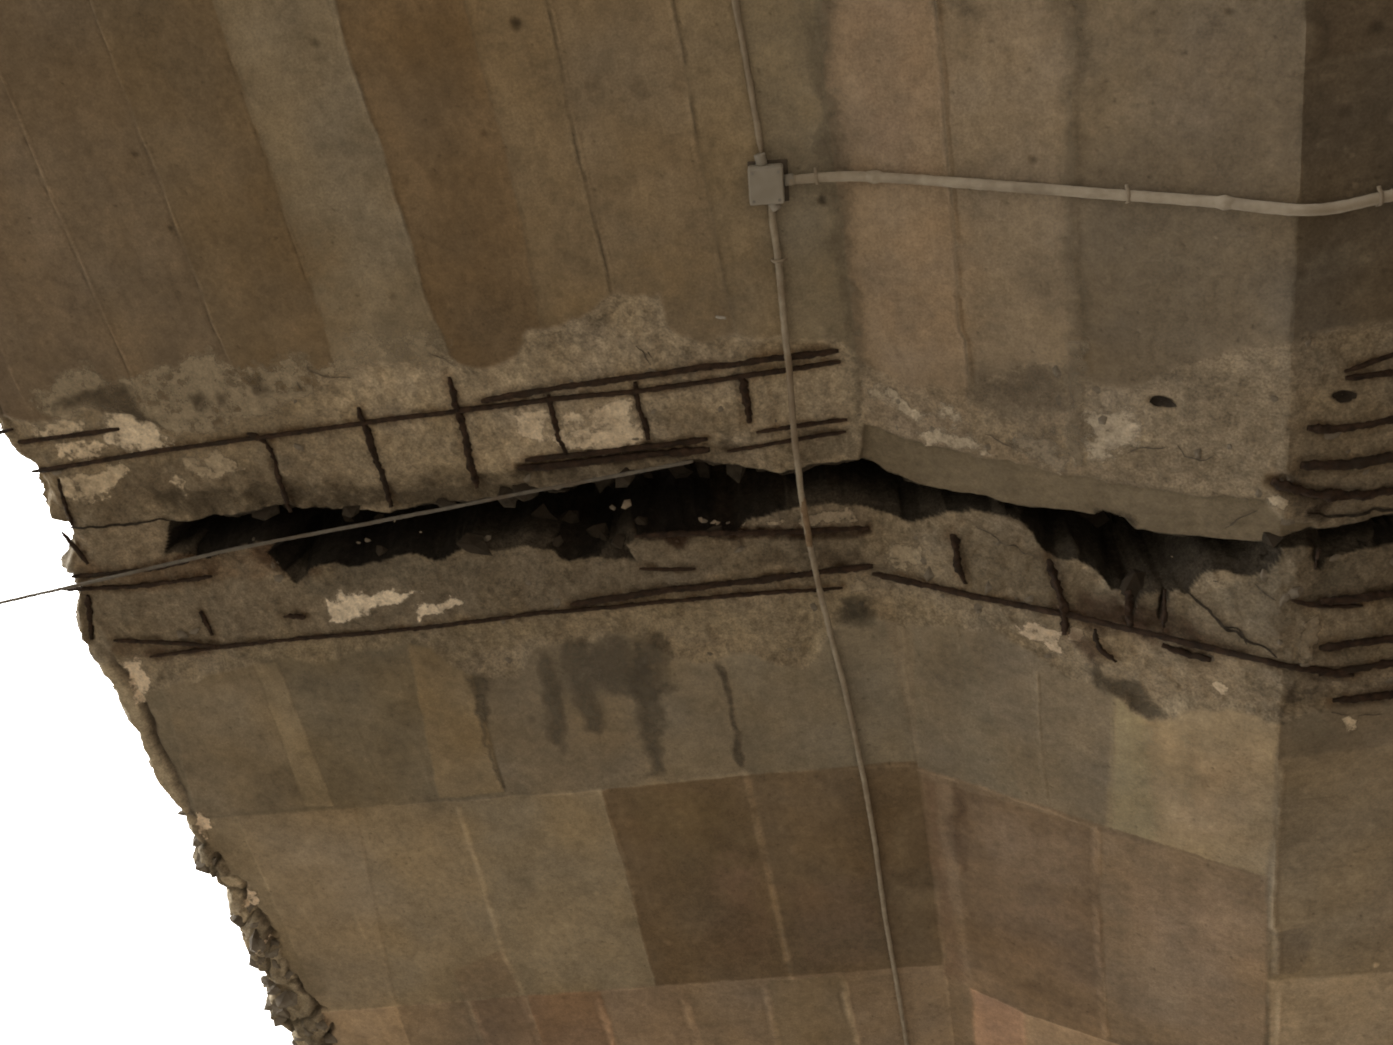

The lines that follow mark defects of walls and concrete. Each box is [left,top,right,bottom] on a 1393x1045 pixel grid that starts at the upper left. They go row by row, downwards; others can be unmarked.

spalling [0,292,1393,724]
crack [70,458,1393,658]
damp [539,635,668,775]
damp [717,667,744,766]